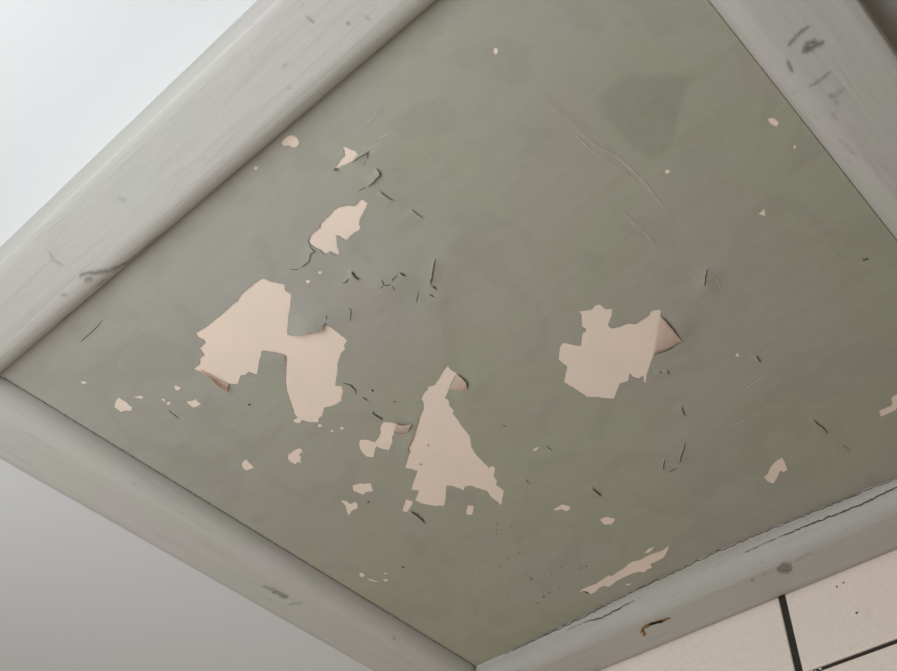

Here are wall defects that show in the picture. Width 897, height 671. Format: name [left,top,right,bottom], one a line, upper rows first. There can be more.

peeling [333,147,357,172]
crack [352,153,392,200]
peeling [308,199,368,255]
peeling [195,279,347,432]
peeling [558,305,682,399]
peeling [879,395,897,417]
peeling [359,366,504,512]
peeling [765,458,787,483]
peeling [580,546,669,594]